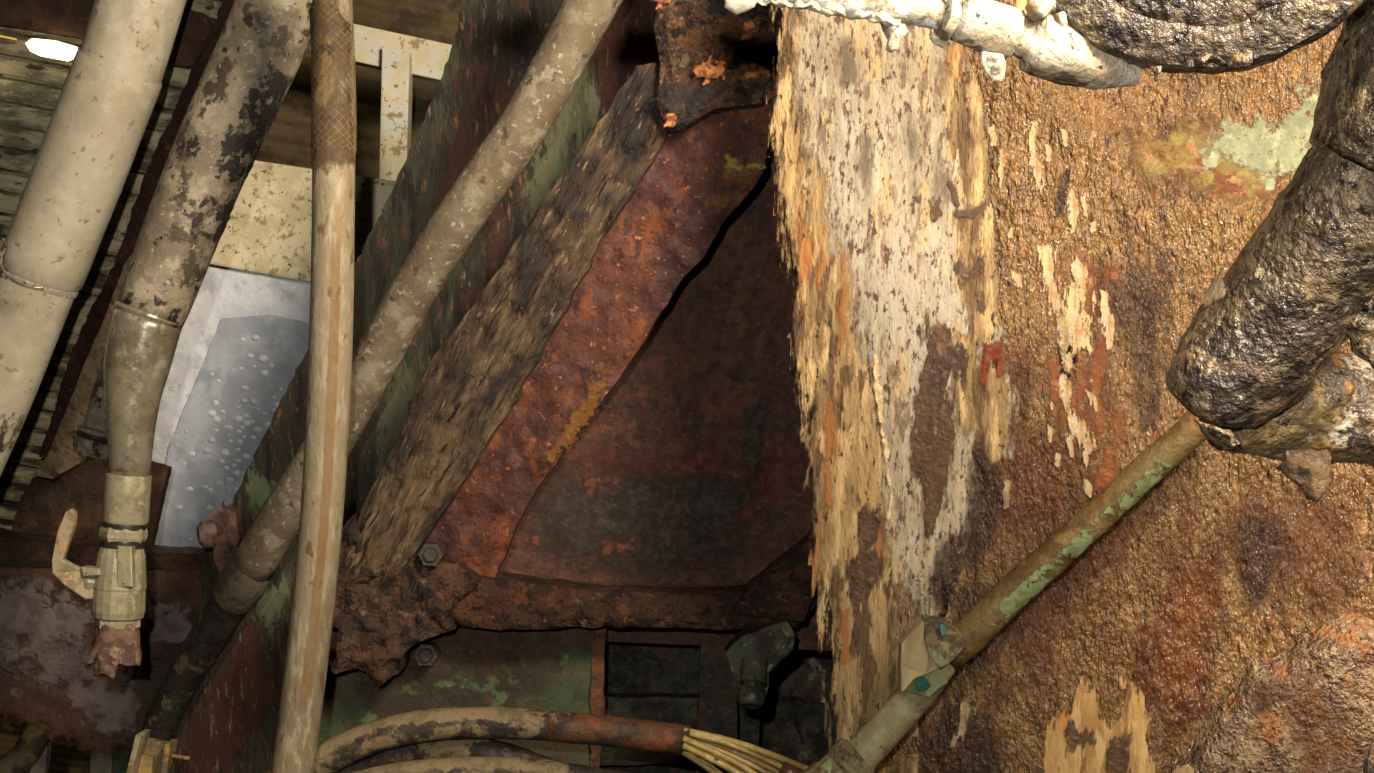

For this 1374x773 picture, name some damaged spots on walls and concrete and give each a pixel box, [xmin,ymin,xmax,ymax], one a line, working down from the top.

corrosion [431,47,513,211]
corrosion [664,113,677,127]
peeling [1024,119,1068,194]
corrosion [457,201,522,320]
peeling [1064,191,1096,234]
corrosion [545,363,617,472]
peeling [766,6,1022,748]
peeling [1037,244,1117,498]
corrosion [600,537,635,555]
peeling [988,456,1172,626]
corrosion [350,625,607,715]
spalling [1038,673,1156,773]